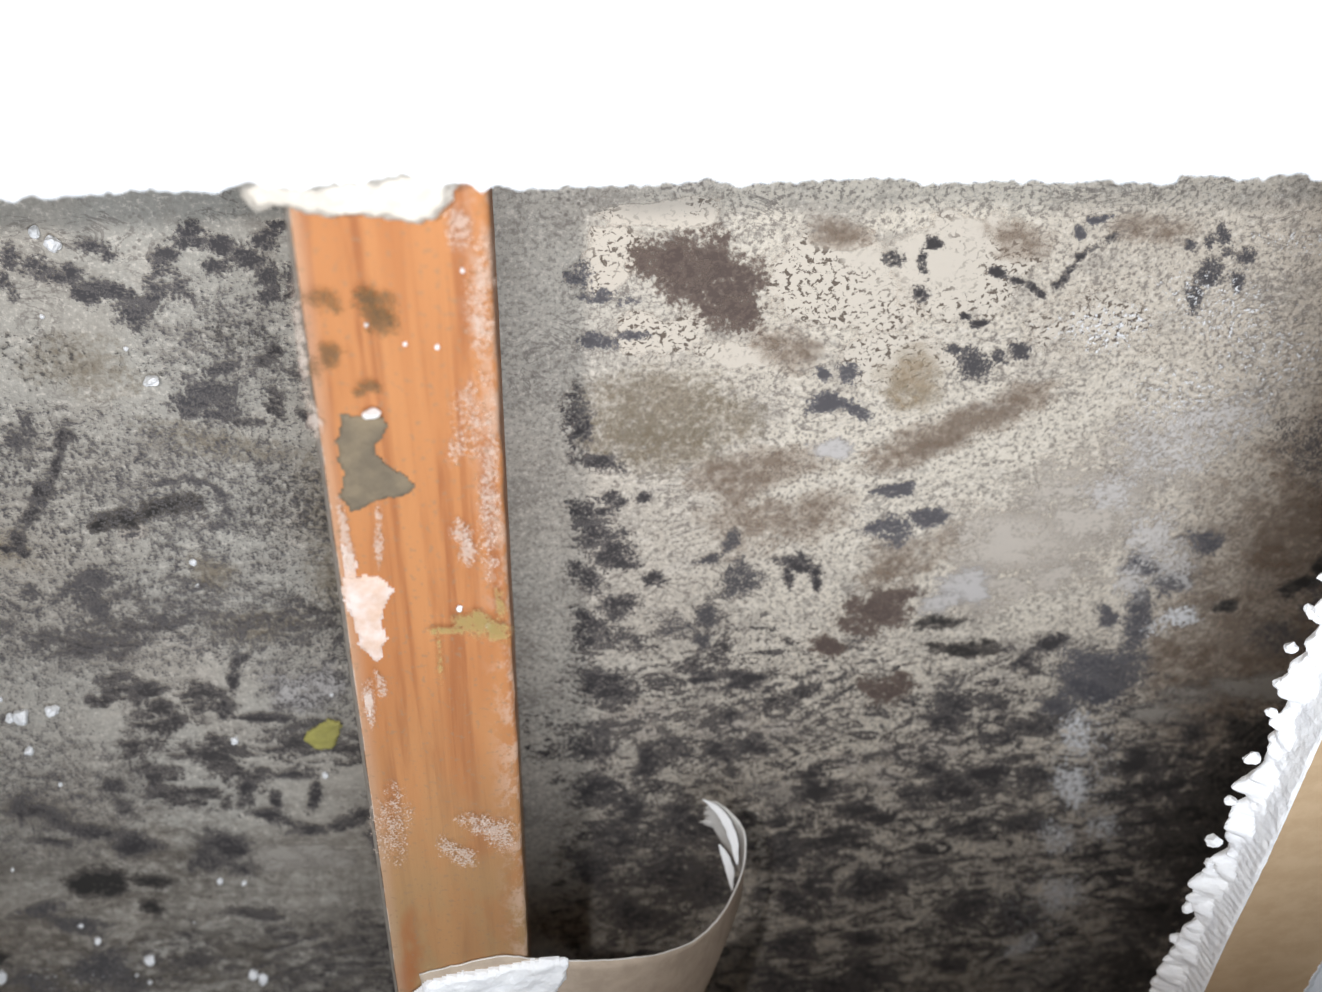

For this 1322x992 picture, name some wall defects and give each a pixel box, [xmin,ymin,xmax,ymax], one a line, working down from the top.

water stain [0,217,400,992]
peeling [341,544,394,662]
water stain [430,589,509,672]
water stain [523,220,1322,992]
peeling [1283,642,1299,654]
peeling [1303,603,1317,620]
peeling [364,693,373,717]
peeling [1118,671,1288,724]
peeling [1181,901,1194,914]
peeling [1204,740,1322,992]